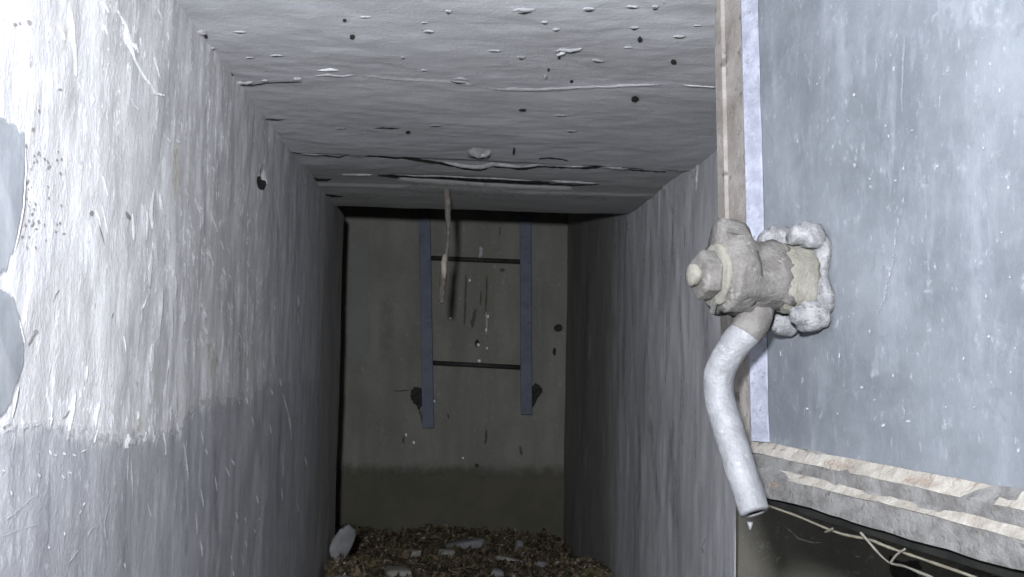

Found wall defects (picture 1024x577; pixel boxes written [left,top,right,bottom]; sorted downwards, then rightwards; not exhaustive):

spalling [555,48,583,59]
peeling [0,117,66,273]
crack [297,153,666,173]
leakage [131,187,198,432]
leakage [185,188,249,405]
leakage [68,392,76,434]
leakage [335,457,564,541]